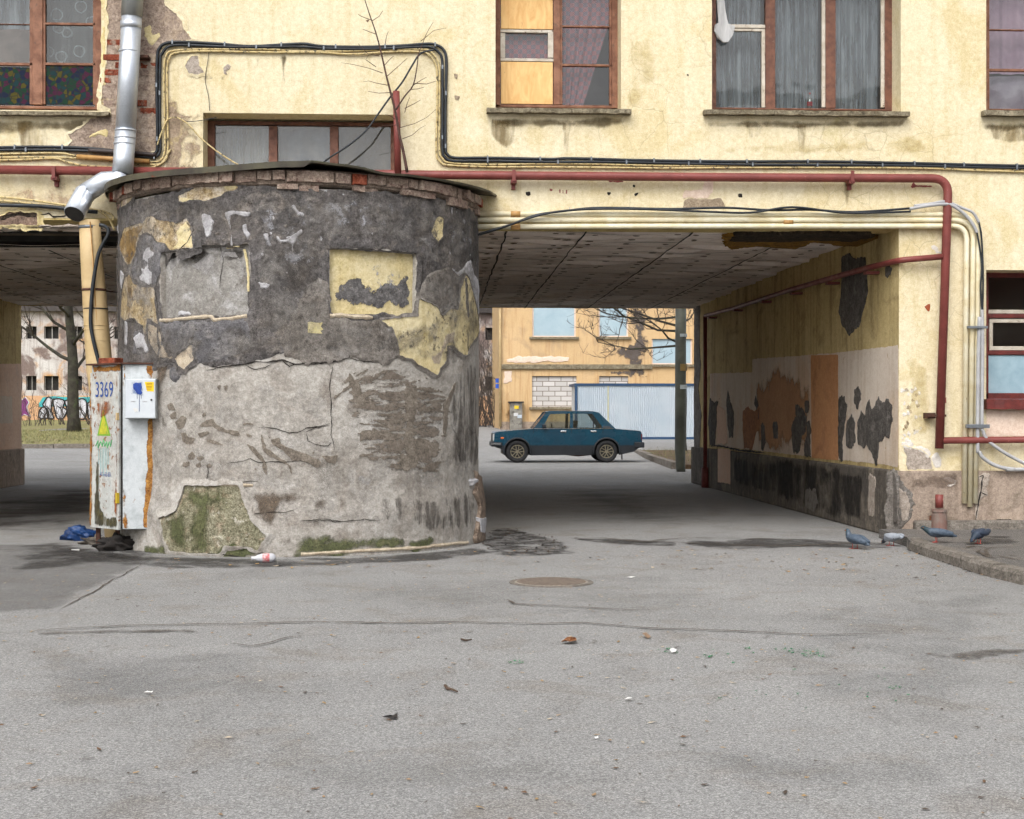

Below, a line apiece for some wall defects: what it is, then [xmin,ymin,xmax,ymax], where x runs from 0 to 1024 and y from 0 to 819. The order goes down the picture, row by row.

flaking render [62,0,122,166]
flaking render [134,0,209,168]
flaking render [118,185,246,375]
peeling [838,253,868,336]
flaking render [152,403,276,557]
crack [207,355,374,482]
crack [254,509,380,523]
water stain [330,368,478,472]
water stain [414,491,473,530]
peeling [791,400,811,457]
peeling [838,386,941,517]